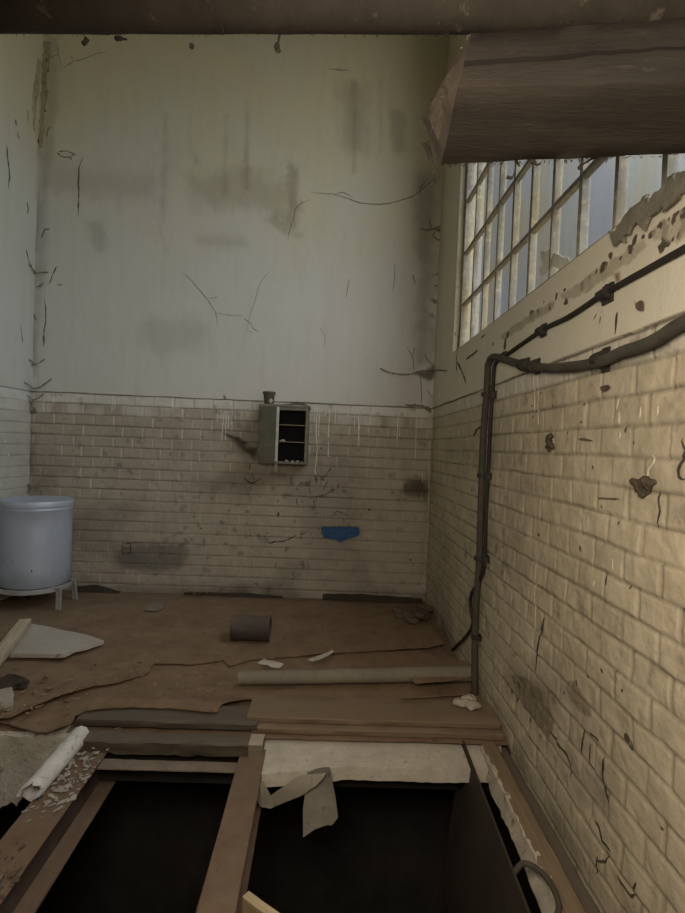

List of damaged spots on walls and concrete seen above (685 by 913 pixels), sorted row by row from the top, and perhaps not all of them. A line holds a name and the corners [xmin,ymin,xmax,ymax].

crack [182,270,270,333]
crack [288,177,439,237]
spalling [492,206,685,350]
crack [550,730,636,899]